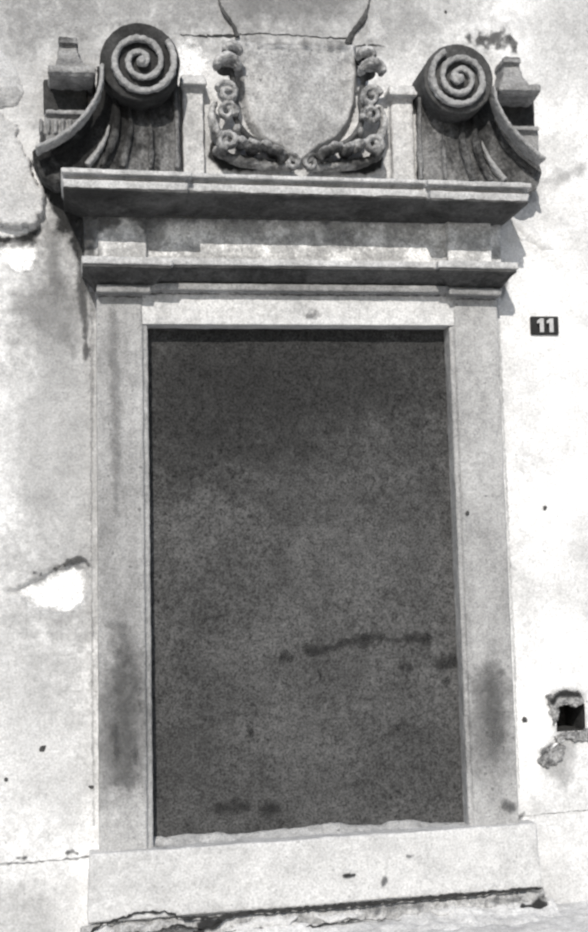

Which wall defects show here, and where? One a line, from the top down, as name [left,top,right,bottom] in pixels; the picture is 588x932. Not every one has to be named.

flaking render [0,112,47,272]
spalling [20,555,90,612]
spalling [537,689,588,769]
peeling [94,924,117,932]
peeling [230,913,298,928]
peeling [316,913,358,923]